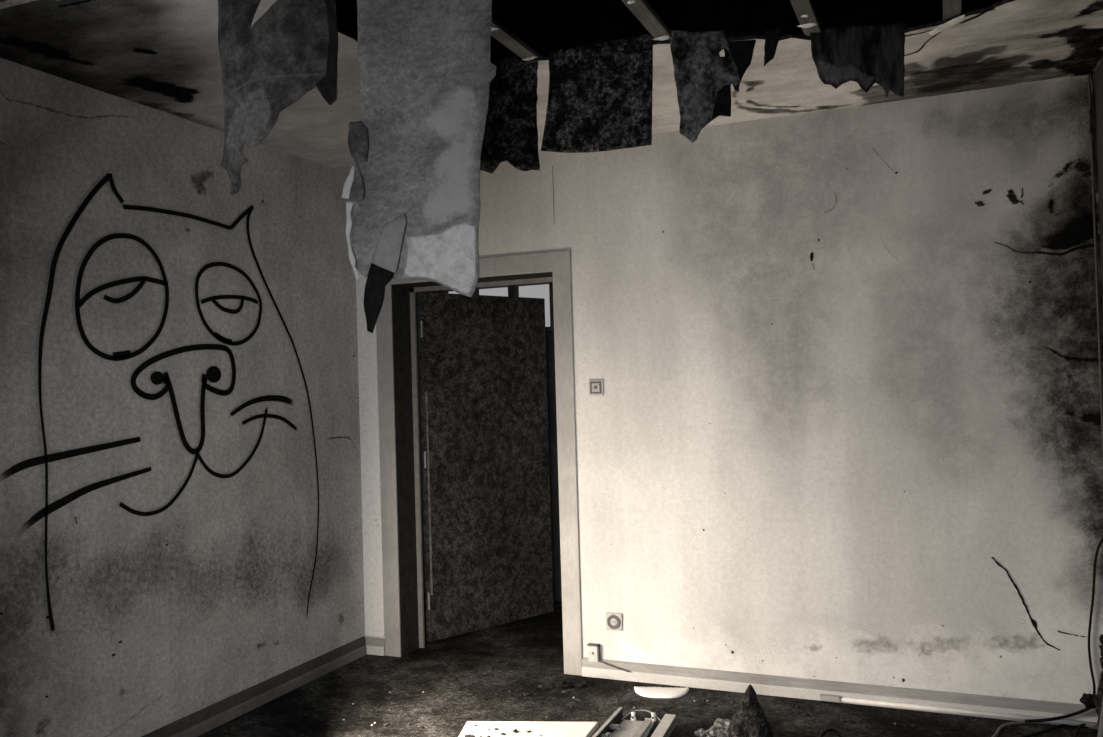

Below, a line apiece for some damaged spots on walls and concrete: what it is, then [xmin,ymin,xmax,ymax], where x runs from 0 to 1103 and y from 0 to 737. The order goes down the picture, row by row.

spalling [929,14,965,35]
water stain [125,77,200,103]
water stain [1055,158,1091,178]
crack [991,557,1085,651]